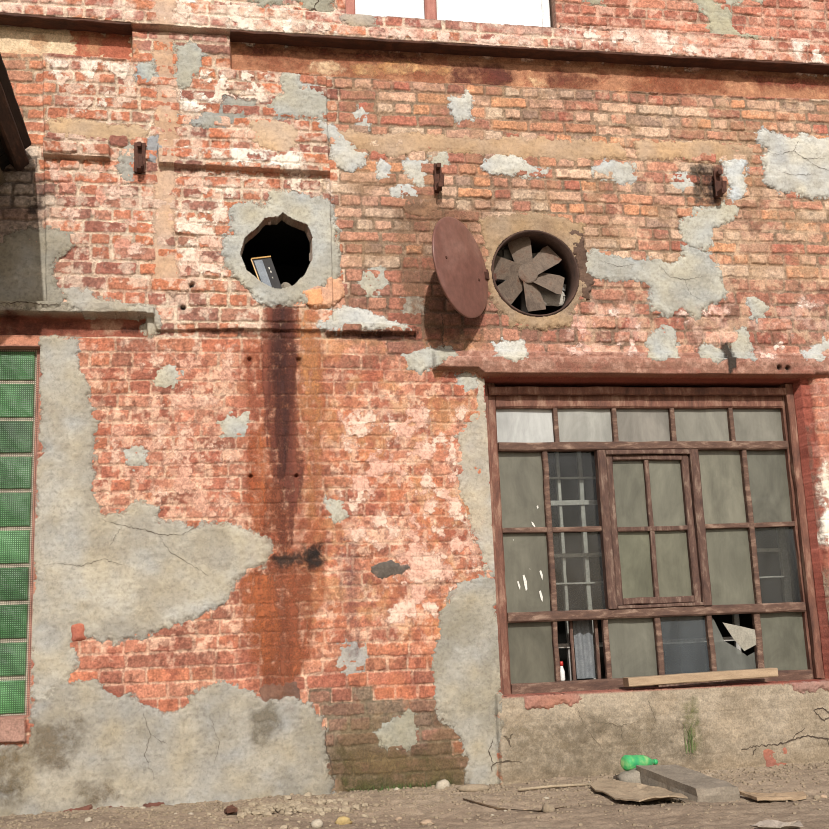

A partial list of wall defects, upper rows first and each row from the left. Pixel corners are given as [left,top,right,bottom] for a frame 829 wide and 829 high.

peeling [176,146,307,292]
spalling [302,277,345,310]
peeling [703,304,730,319]
peeling [566,321,595,356]
peeling [756,341,785,359]
crack [70,519,208,576]
spalling [71,623,86,642]
spalling [259,681,300,702]
crack [741,707,829,761]